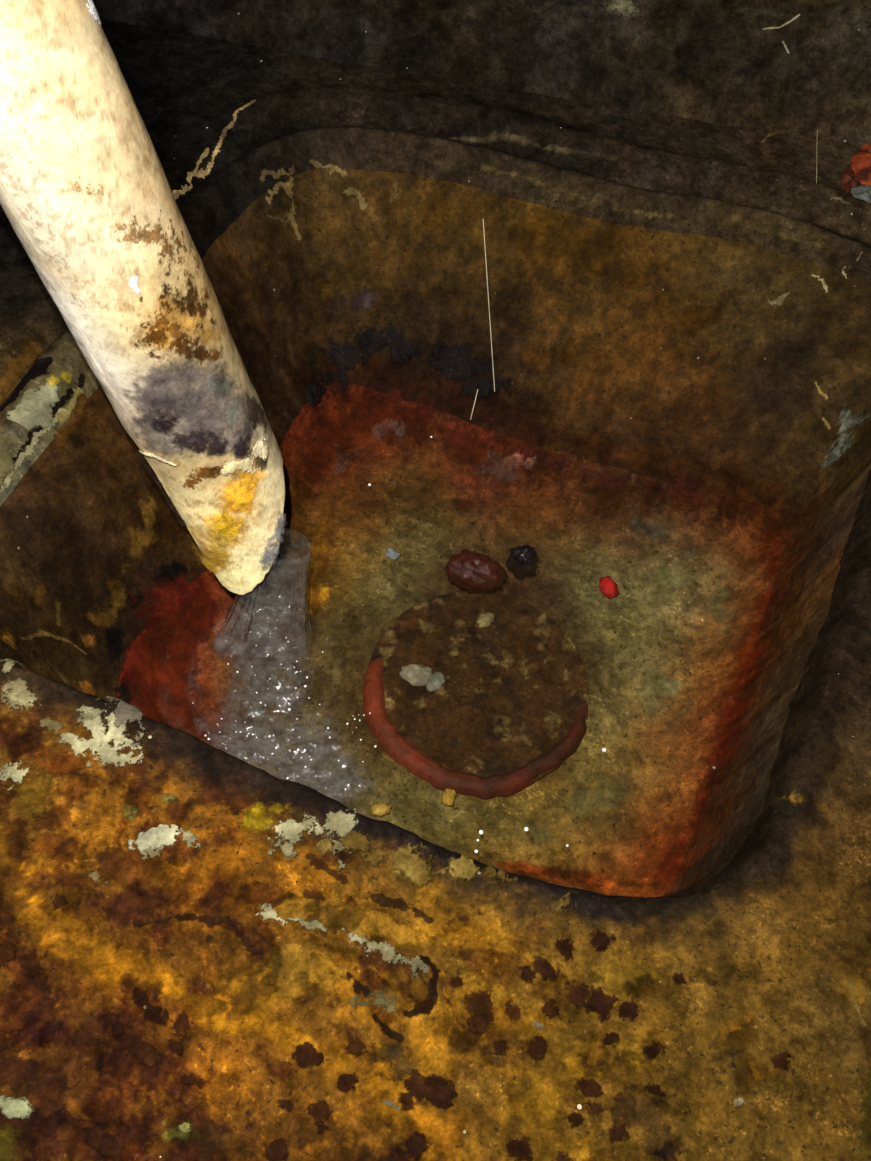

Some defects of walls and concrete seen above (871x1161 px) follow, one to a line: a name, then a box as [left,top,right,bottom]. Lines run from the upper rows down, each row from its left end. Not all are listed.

rust [52,394,88,448]
rust [182,461,226,489]
water stain [261,511,285,570]
rust [303,513,334,618]
rust [2,493,217,746]
water stain [242,802,284,830]
rust [0,821,687,1161]
rust [771,1051,790,1070]